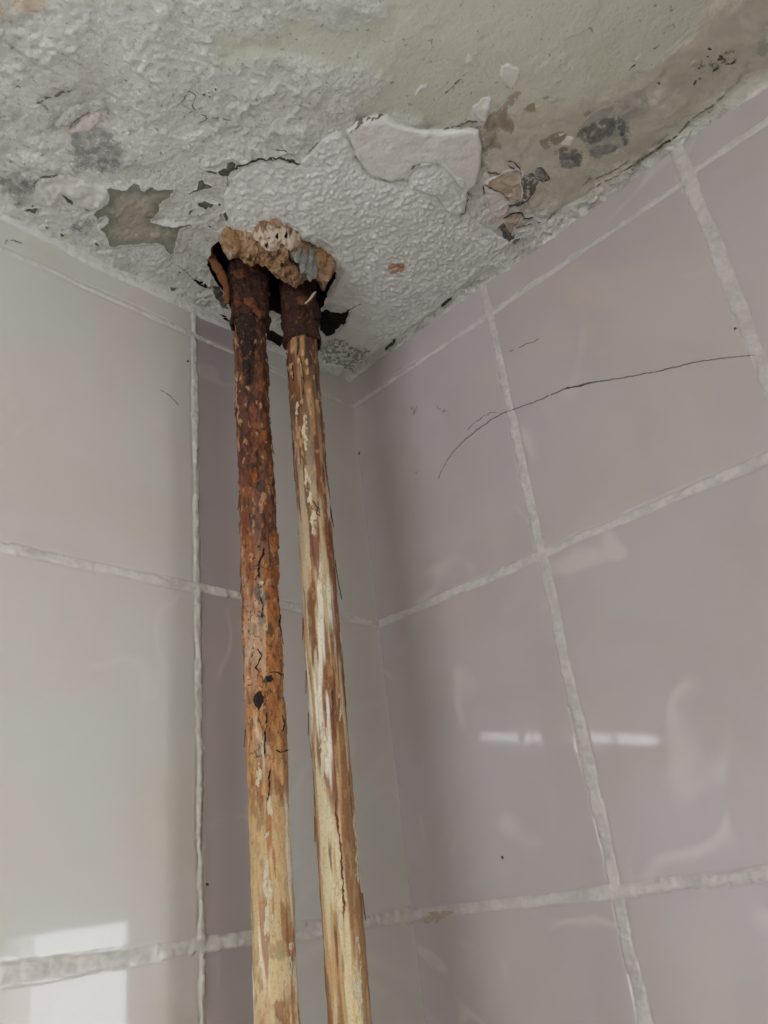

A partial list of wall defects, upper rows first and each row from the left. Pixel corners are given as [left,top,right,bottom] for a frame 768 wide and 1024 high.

water stain [480,0,768,209]
peeling [402,161,469,216]
peeling [19,160,238,322]
hole [268,263,284,315]
spalling [316,272,361,336]
spalling [266,330,283,347]
crack [438,355,754,479]
corrosion [269,532,280,553]